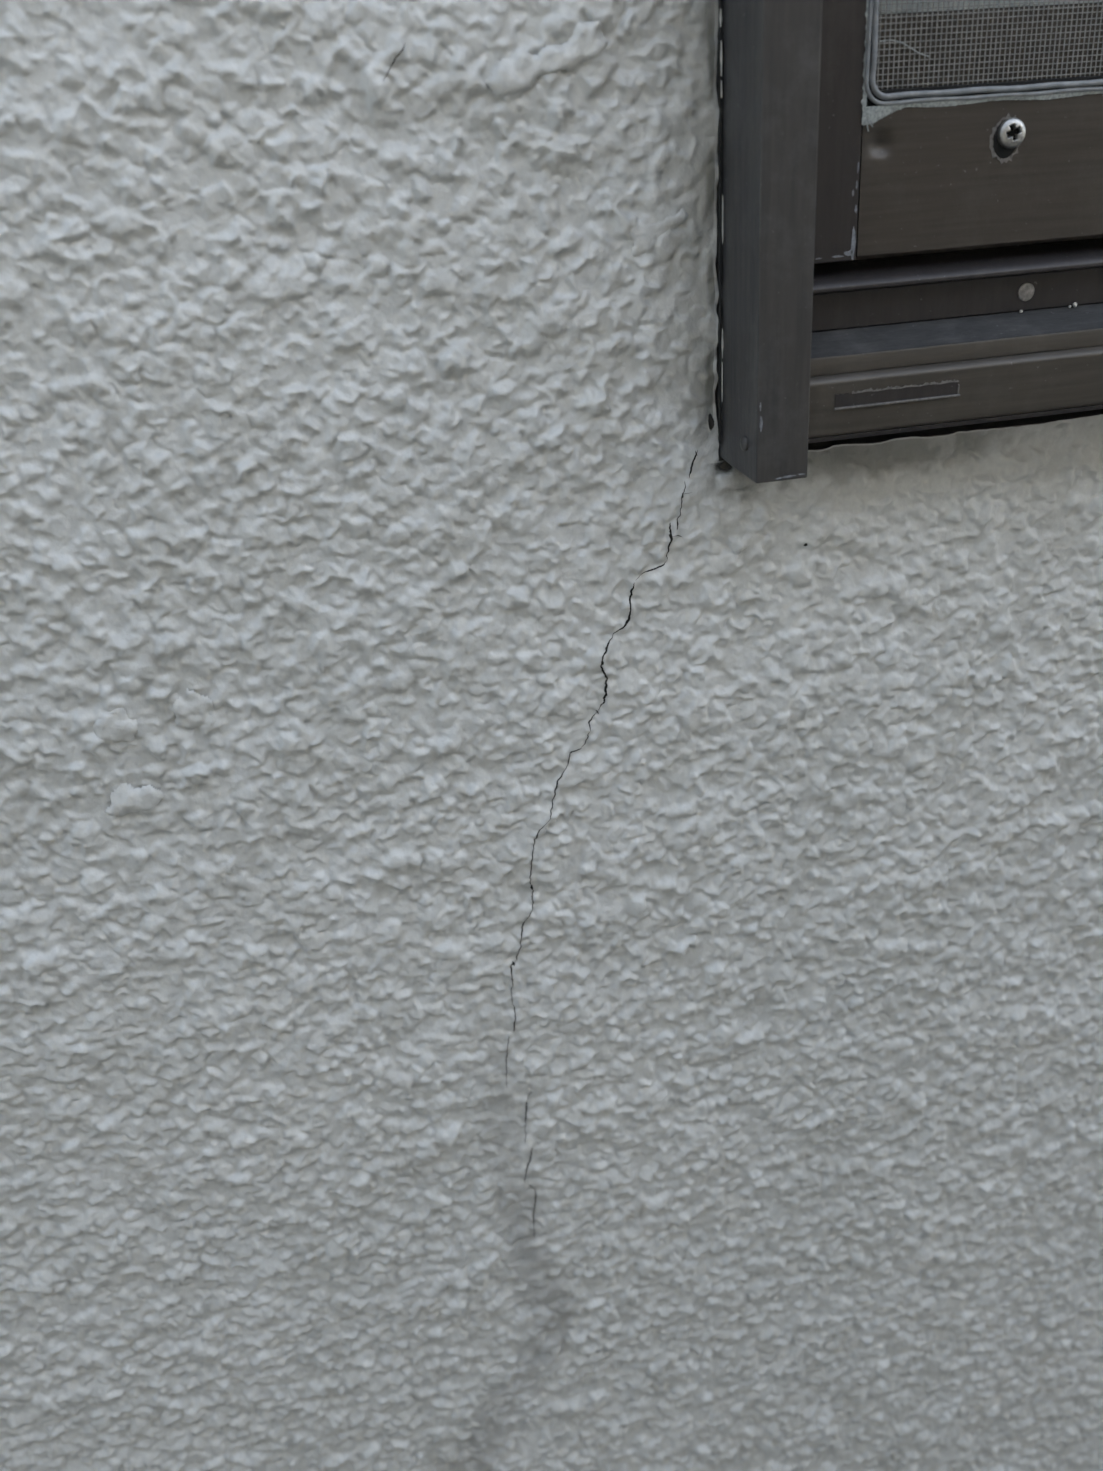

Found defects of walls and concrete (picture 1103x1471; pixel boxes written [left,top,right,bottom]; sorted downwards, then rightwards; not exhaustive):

crack [506,0,724,1236]